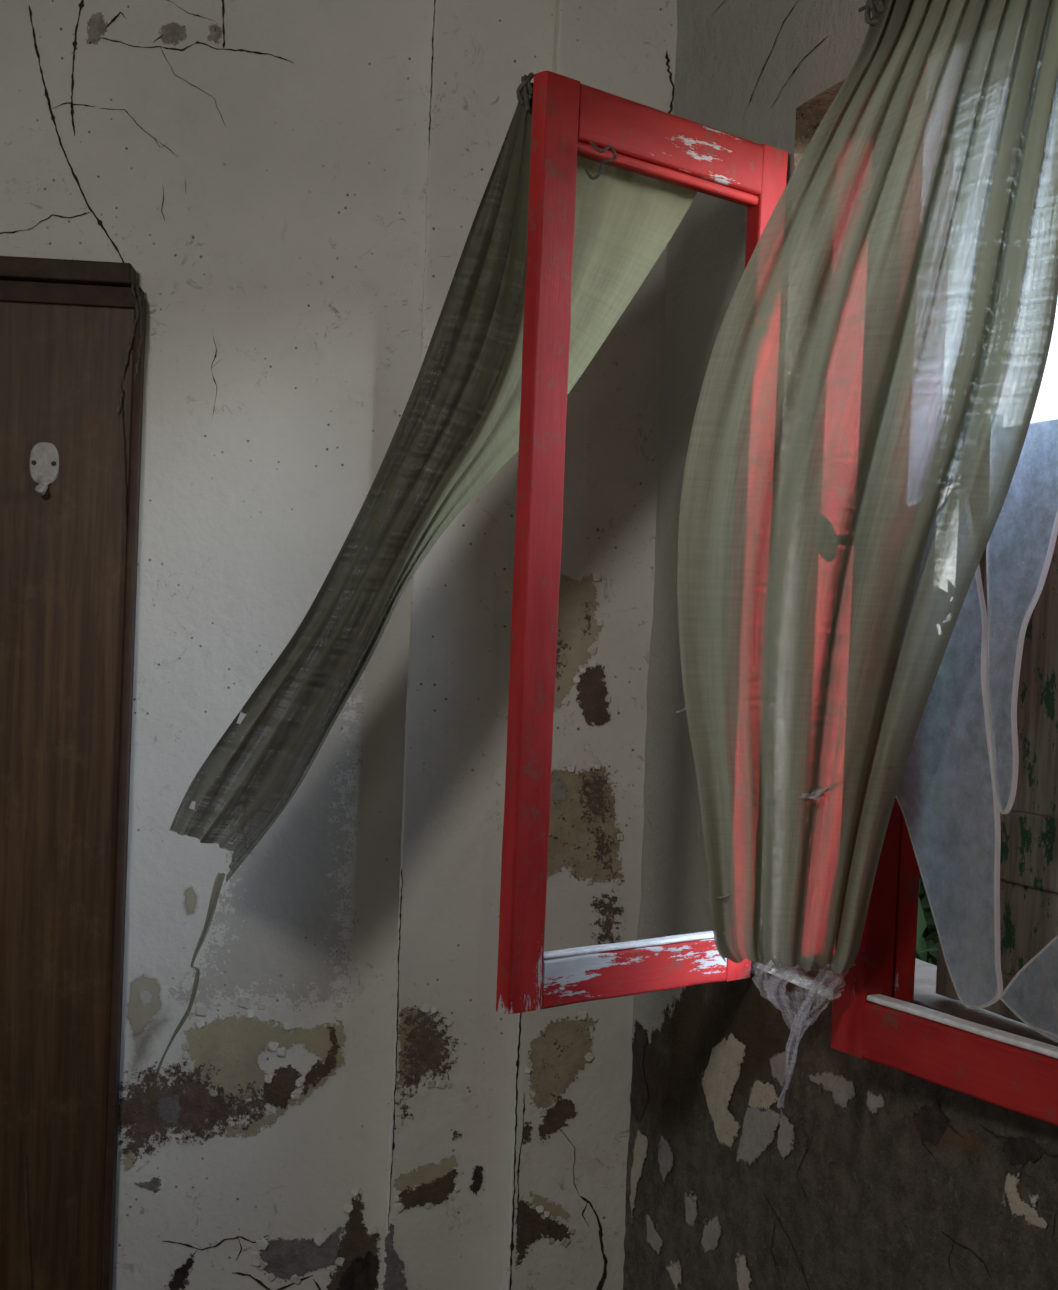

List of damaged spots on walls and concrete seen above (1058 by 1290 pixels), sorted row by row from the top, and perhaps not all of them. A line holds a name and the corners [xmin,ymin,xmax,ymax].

crack [0,0,293,263]
peeling [554,573,611,726]
peeling [547,764,626,945]
peeling [118,1010,346,1193]
flaking render [236,1129,483,1290]
flaking render [630,1021,682,1290]
peeling [684,1190,721,1253]
peeling [735,1251,752,1290]
peeling [702,1033,884,1165]
peeling [1002,1173,1049,1232]